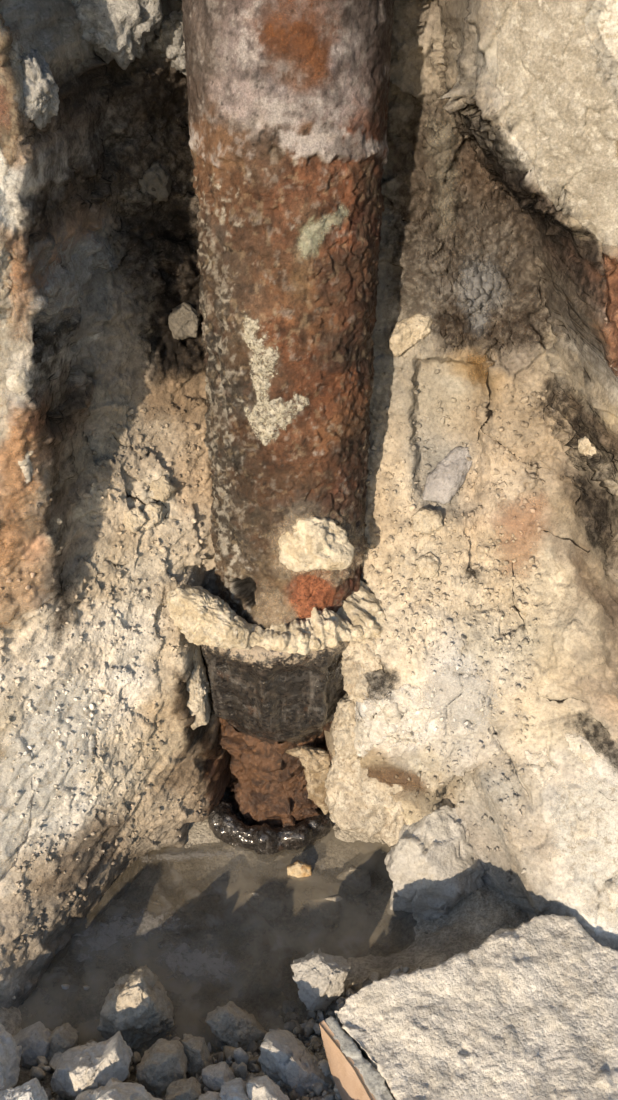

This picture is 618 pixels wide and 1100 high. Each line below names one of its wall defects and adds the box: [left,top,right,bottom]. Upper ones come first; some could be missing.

spalling [0,14,49,206]
spalling [492,0,618,246]
spalling [0,231,36,415]
water stain [17,57,206,503]
water stain [387,99,612,369]
rust [0,427,33,566]
water stain [43,518,78,635]
rust [289,570,334,620]
water stain [539,378,618,566]
spalling [0,674,106,872]
spalling [524,747,618,926]
spalling [565,733,598,761]